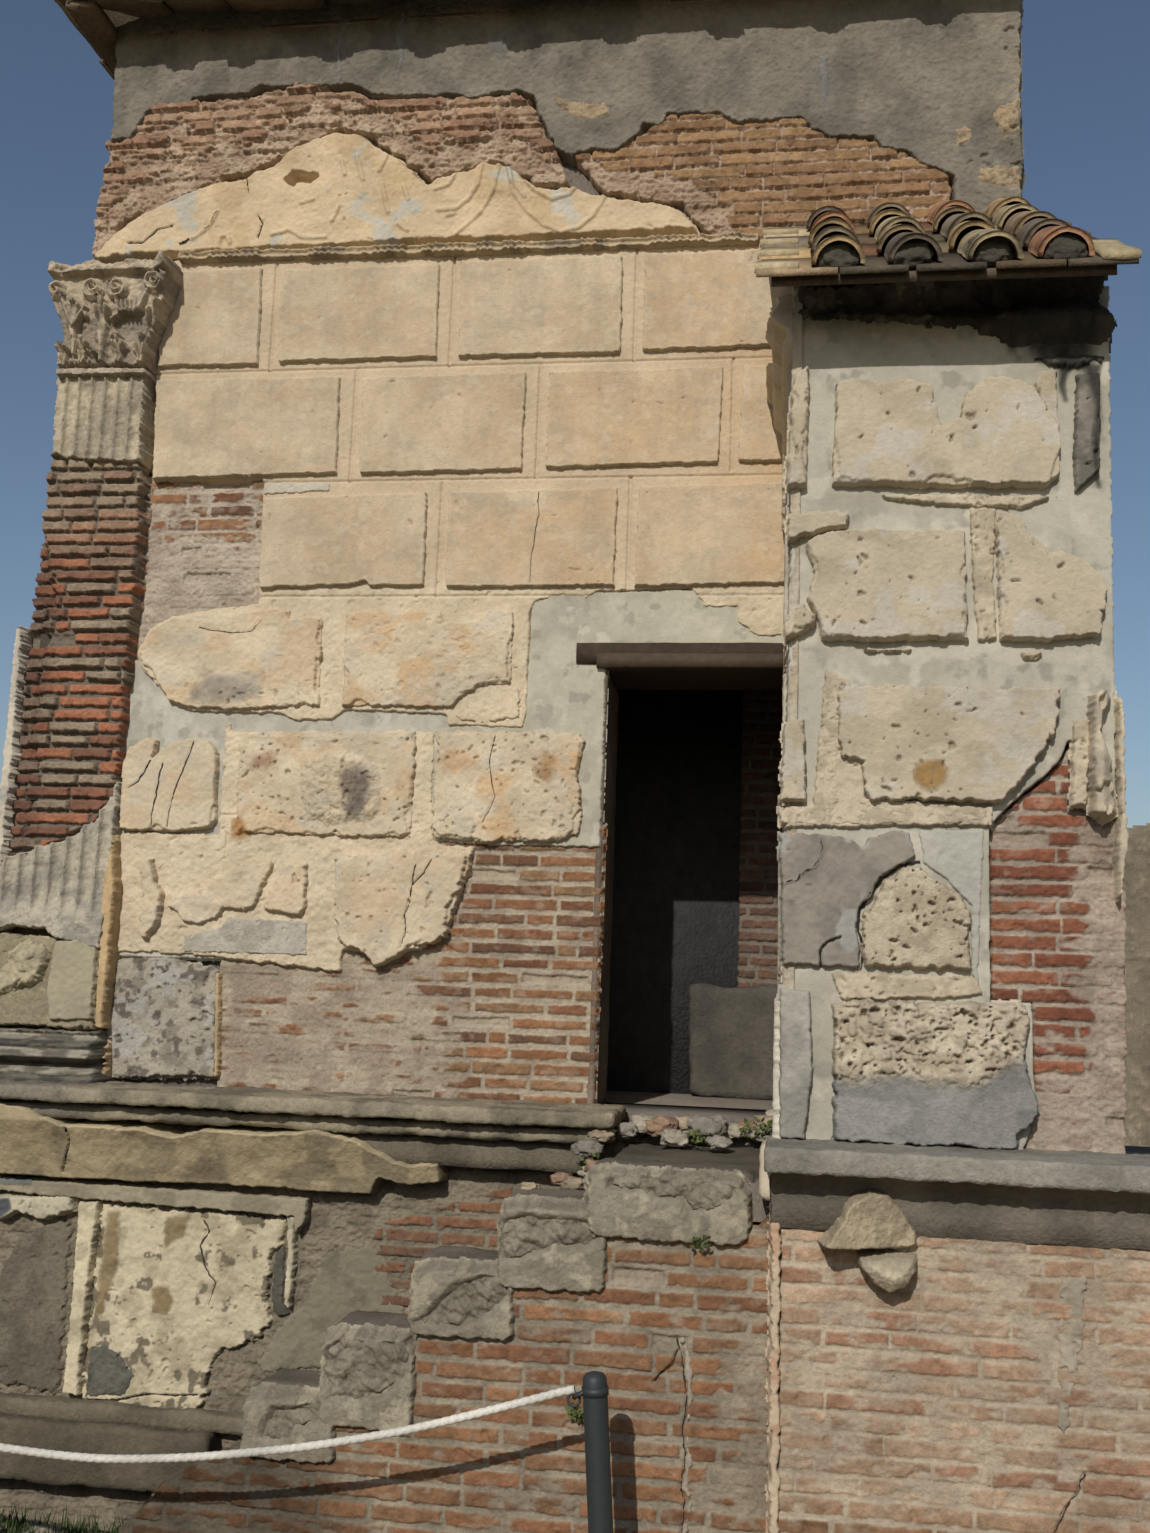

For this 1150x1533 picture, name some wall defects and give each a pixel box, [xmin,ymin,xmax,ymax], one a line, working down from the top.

flaking render [92,82,953,257]
peeling [81,1201,288,1409]
crack [200,1220,216,1305]
crack [1054,1473,1086,1533]